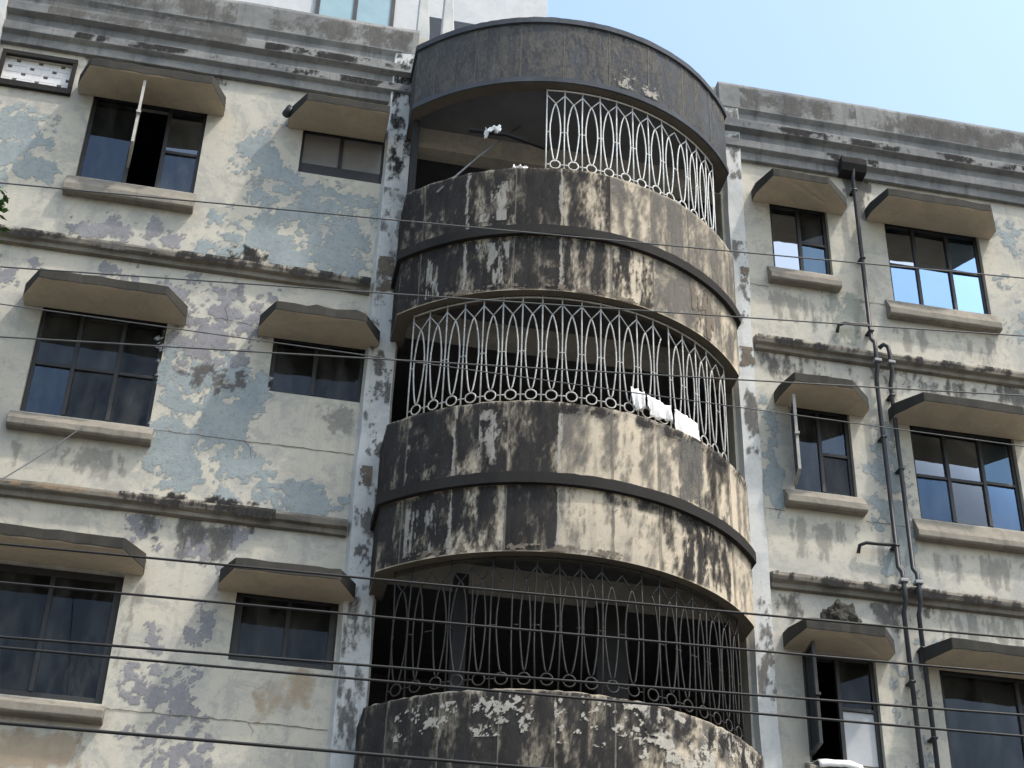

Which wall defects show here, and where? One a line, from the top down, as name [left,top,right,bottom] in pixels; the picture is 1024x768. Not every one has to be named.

leakage [878,116,1024,170]
peeling [66,120,394,293]
leakage [175,19,909,362]
peeling [141,271,351,516]
crack [154,429,354,455]
leakage [119,490,276,560]
leakage [332,346,804,768]
leakage [812,576,1022,632]
peeling [114,620,215,768]
crack [106,708,325,736]
peeling [469,695,533,737]
peeling [554,696,759,768]